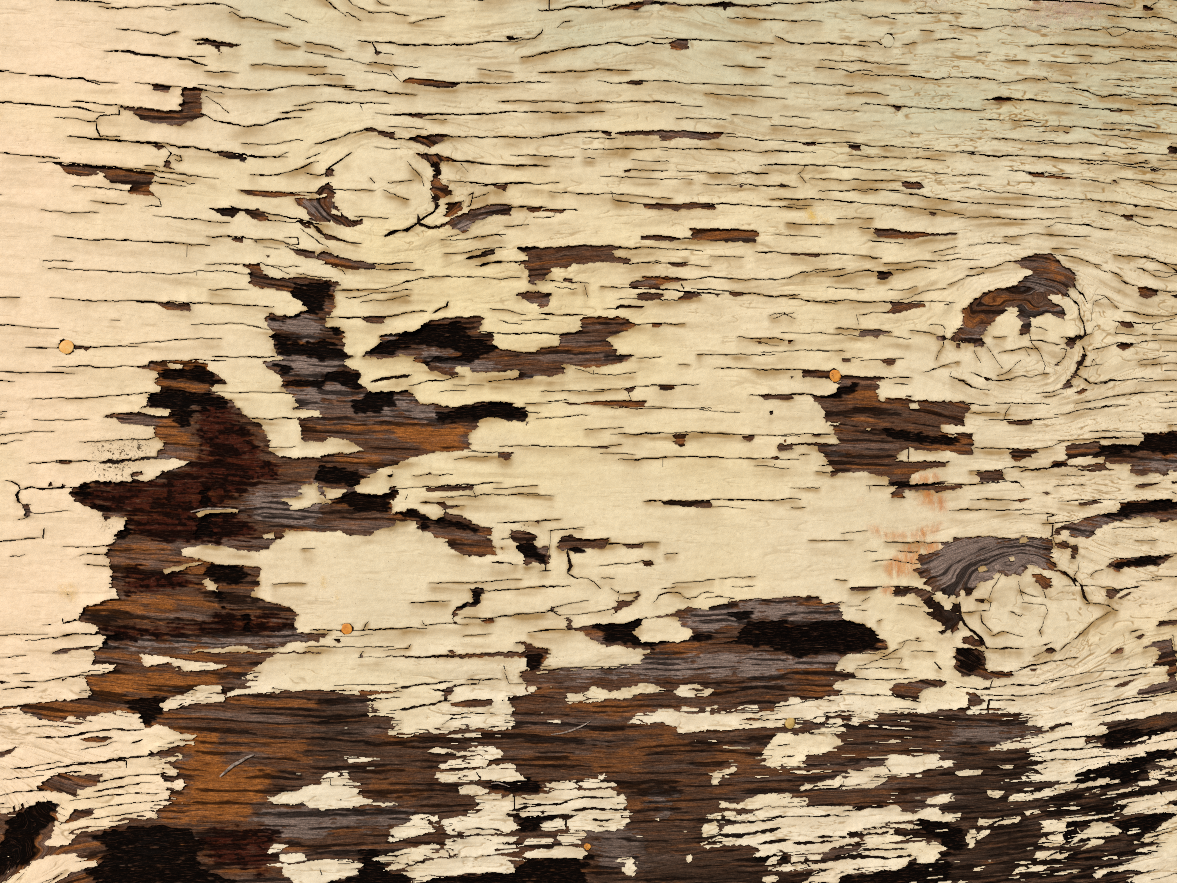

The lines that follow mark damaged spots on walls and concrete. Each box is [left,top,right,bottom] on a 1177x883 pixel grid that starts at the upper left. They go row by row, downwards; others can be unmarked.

peeling [209,168,376,270]
peeling [641,202,716,212]
peeling [641,227,759,243]
peeling [872,228,957,239]
crack [0,0,1177,656]
peeling [0,244,1177,883]
crack [0,618,101,690]
crack [758,526,1177,761]